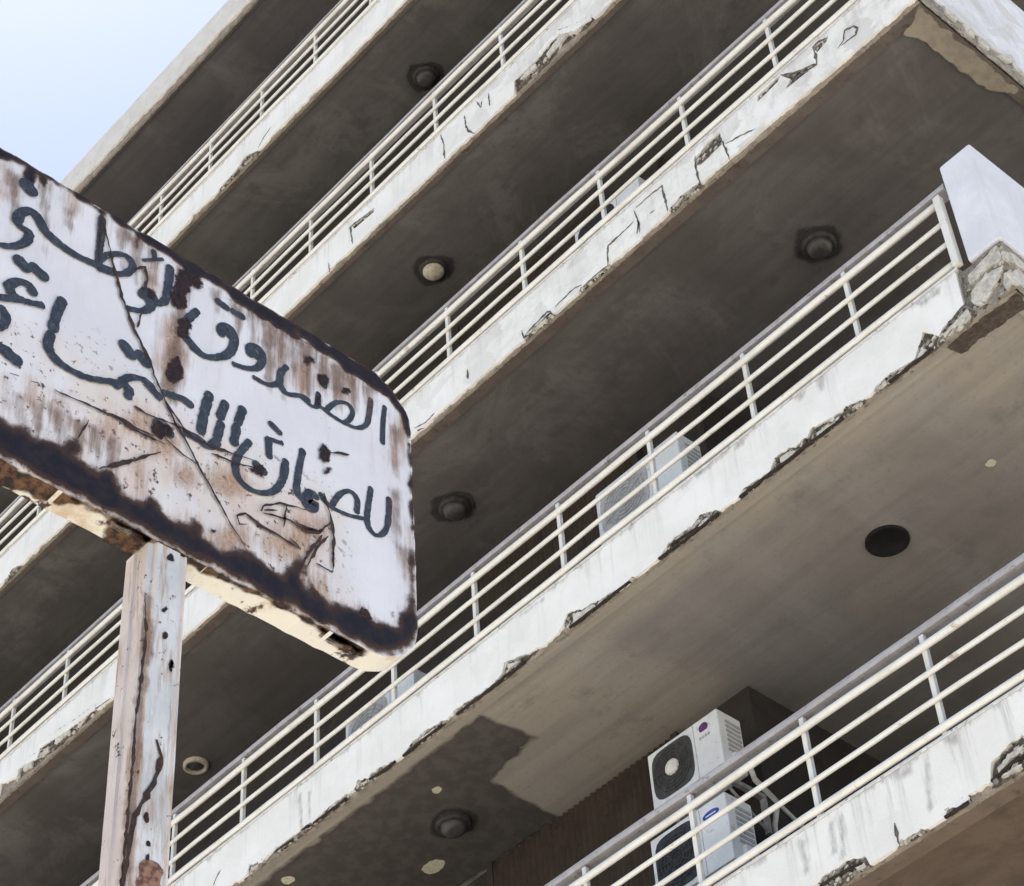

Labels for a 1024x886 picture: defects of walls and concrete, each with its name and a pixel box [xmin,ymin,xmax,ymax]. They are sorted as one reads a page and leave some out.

spalling [514,18,594,92]
crack [780,25,859,86]
crack [440,93,490,159]
crack [694,129,754,185]
crack [522,185,668,339]
spalling [739,241,1024,499]
spalling [658,510,721,560]
spalling [565,576,639,629]
rust [119,593,168,886]
spalling [989,736,1024,789]
damp [260,716,557,886]
spalling [818,858,873,886]